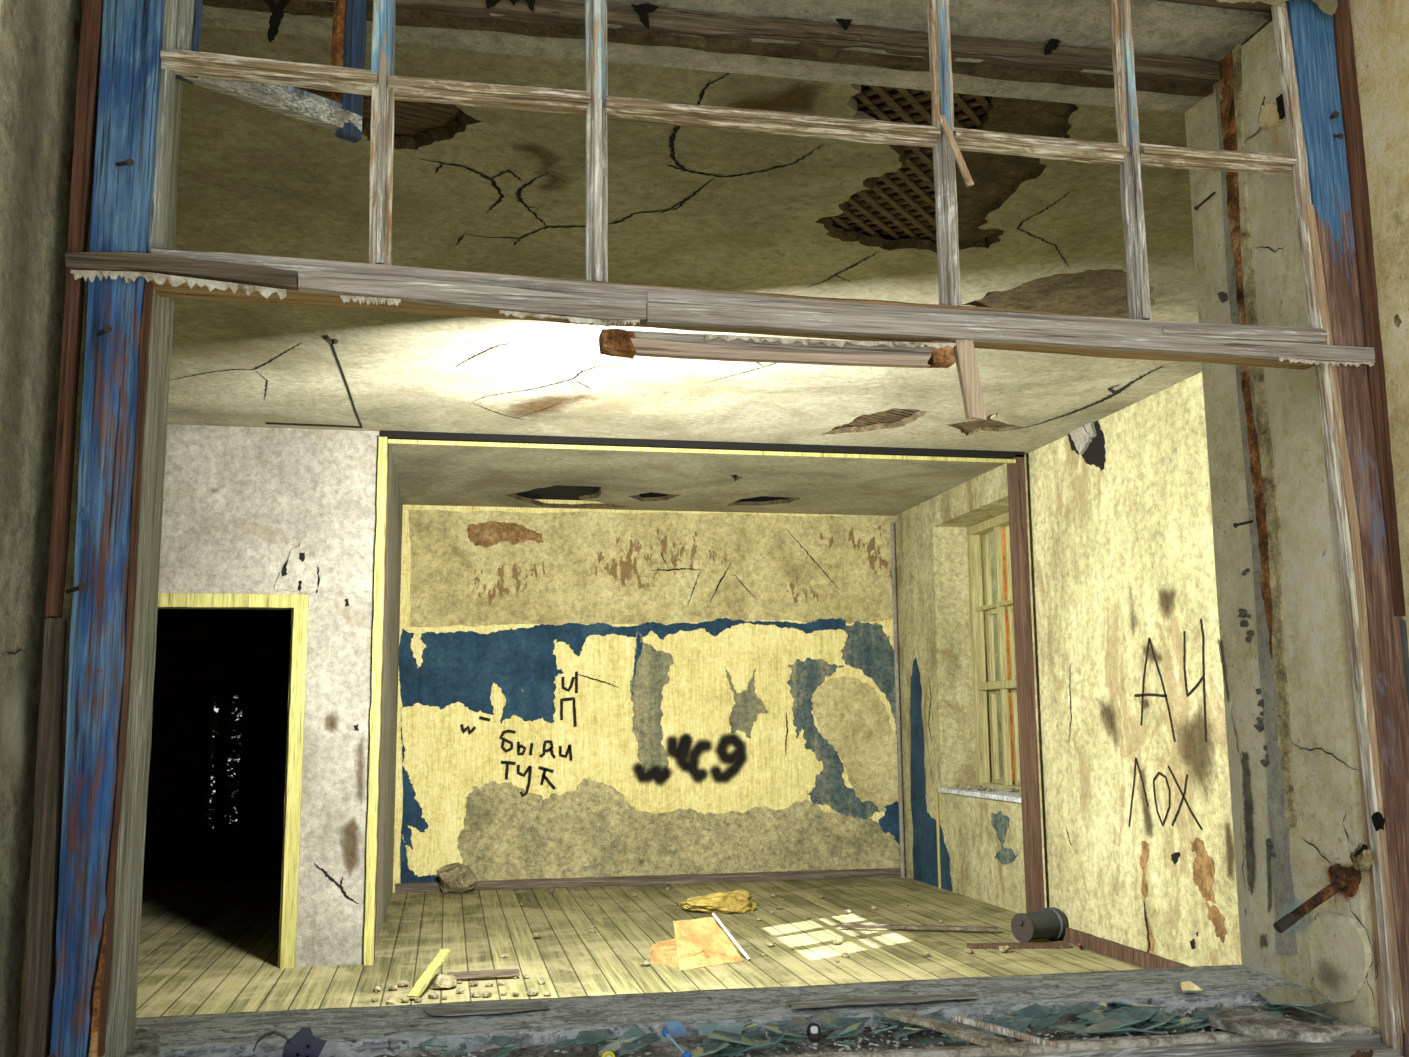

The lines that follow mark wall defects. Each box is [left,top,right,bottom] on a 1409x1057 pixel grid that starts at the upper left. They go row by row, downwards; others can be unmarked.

crack [738,33,1055,59]
crack [421,73,822,246]
flaking render [399,509,953,891]